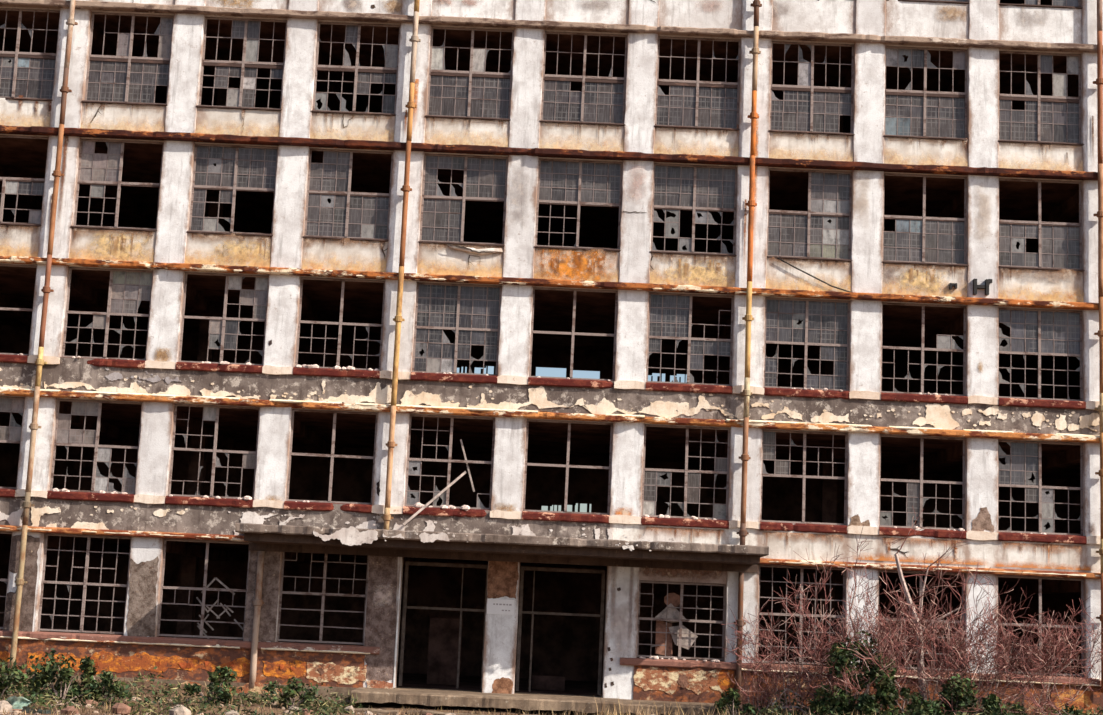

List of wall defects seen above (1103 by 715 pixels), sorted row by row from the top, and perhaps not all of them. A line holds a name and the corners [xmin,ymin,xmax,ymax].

rust [538,248,617,281]
peeling [0,368,1100,431]
peeling [71,506,137,530]
peeling [153,508,188,517]
peeling [228,510,307,535]
peeling [313,516,468,546]
peeling [512,524,536,536]
peeling [582,524,682,551]
spalling [971,507,995,532]
spalling [0,506,61,632]
spalling [126,556,159,637]
peeling [27,650,393,696]